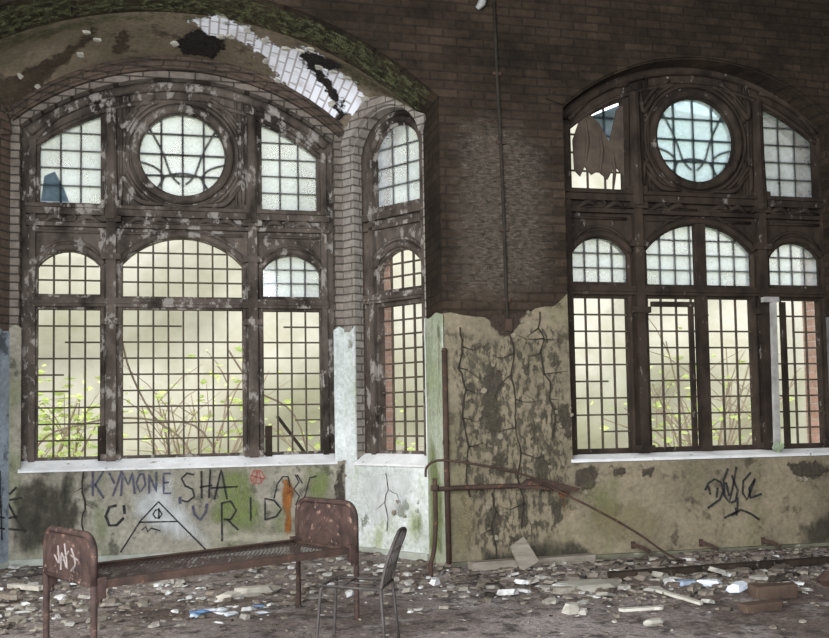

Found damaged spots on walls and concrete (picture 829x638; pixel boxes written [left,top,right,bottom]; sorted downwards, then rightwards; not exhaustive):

flaking render [170,14,370,120]
flaking render [488,310,530,338]
spalling [575,463,602,495]
spalling [787,460,829,482]
crack [377,473,400,529]
damp [801,514,829,543]
damp [485,552,514,560]
damp [530,542,587,557]